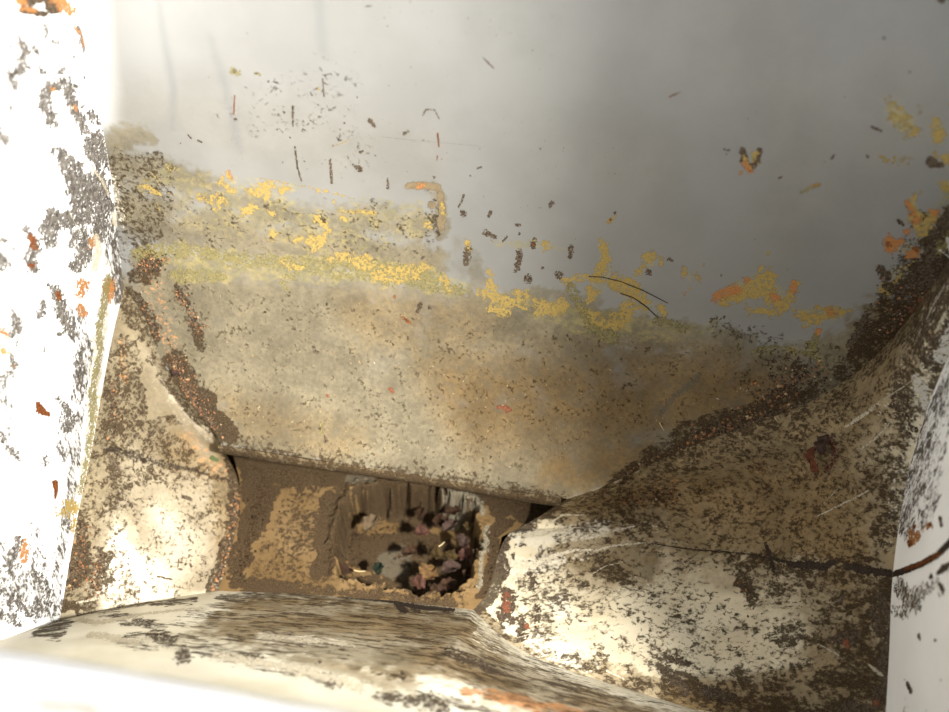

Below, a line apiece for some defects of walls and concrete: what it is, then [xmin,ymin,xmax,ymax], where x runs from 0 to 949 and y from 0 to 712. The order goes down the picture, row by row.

corrosion [15,0,76,18]
peeling [871,95,949,169]
peeling [130,105,705,345]
peeling [711,264,869,372]
peeling [875,191,949,435]
crack [650,539,949,578]